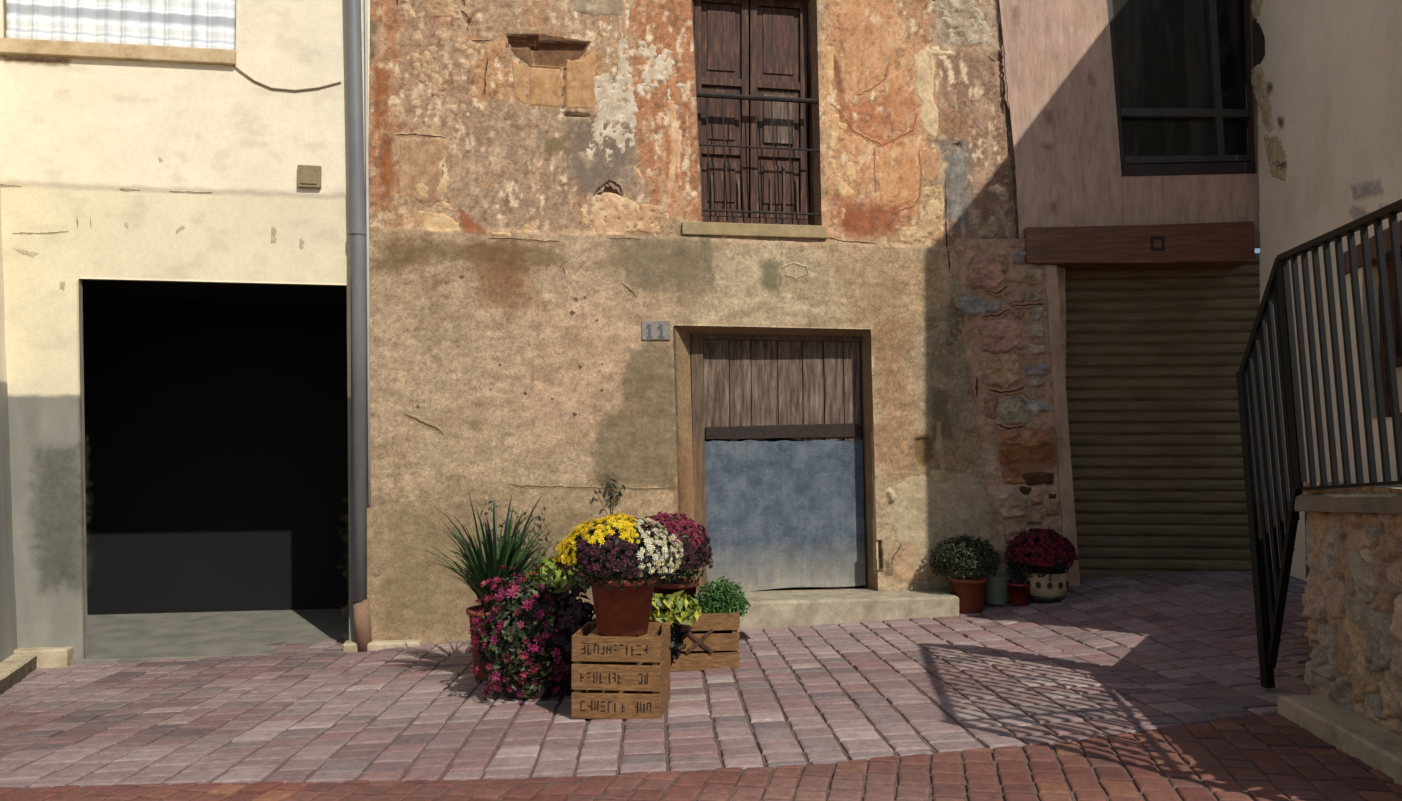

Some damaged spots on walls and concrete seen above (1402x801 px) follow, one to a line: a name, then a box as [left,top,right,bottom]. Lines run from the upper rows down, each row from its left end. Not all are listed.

spalling [506,33,592,70]
peeling [581,0,690,236]